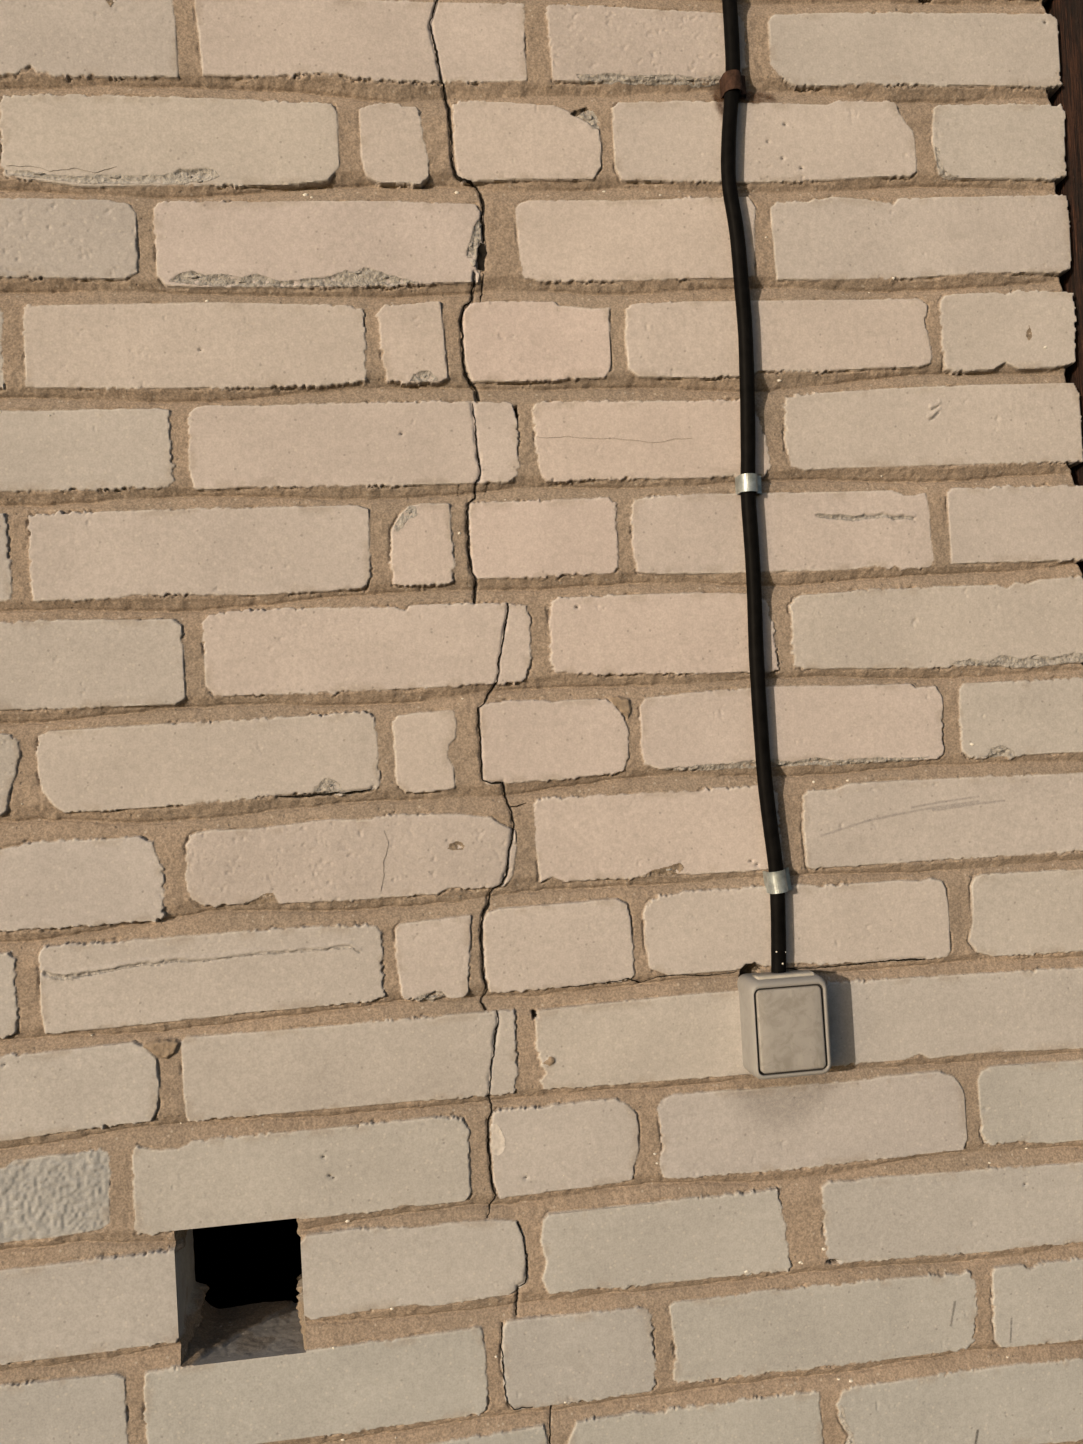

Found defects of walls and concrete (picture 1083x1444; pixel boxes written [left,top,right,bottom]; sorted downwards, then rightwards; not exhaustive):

spalling [5,169,219,185]
spalling [169,268,418,289]
crack [429,0,552,1444]